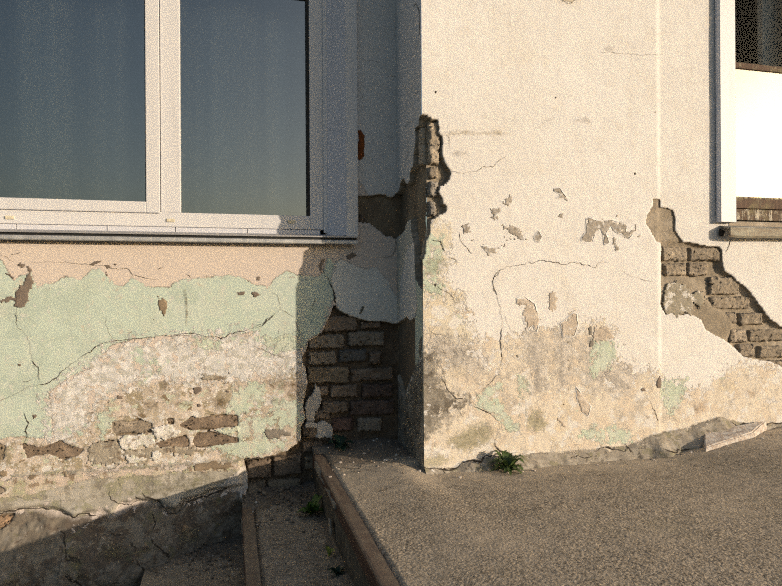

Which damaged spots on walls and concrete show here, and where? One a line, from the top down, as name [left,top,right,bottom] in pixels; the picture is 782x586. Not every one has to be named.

flaking render [358,120,448,280]
peeling [461,194,543,256]
peeling [0,262,34,308]
crack [2,294,302,400]
peeling [157,296,167,316]
flaking render [22,306,422,510]
crack [425,260,607,474]
crack [571,444,632,458]
flaking render [580,199,782,366]
crack [0,483,234,586]